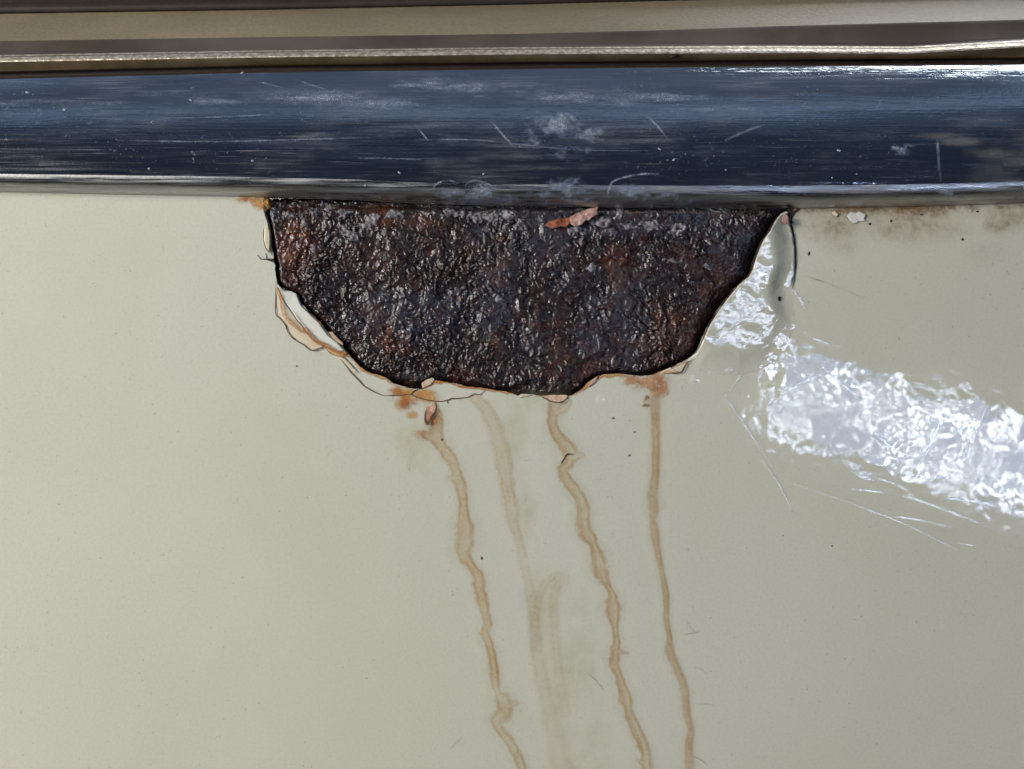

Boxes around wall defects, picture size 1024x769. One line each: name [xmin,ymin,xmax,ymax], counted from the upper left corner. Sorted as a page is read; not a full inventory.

spalling [262,198,789,403]
rust [353,360,514,417]
rust [576,374,667,407]